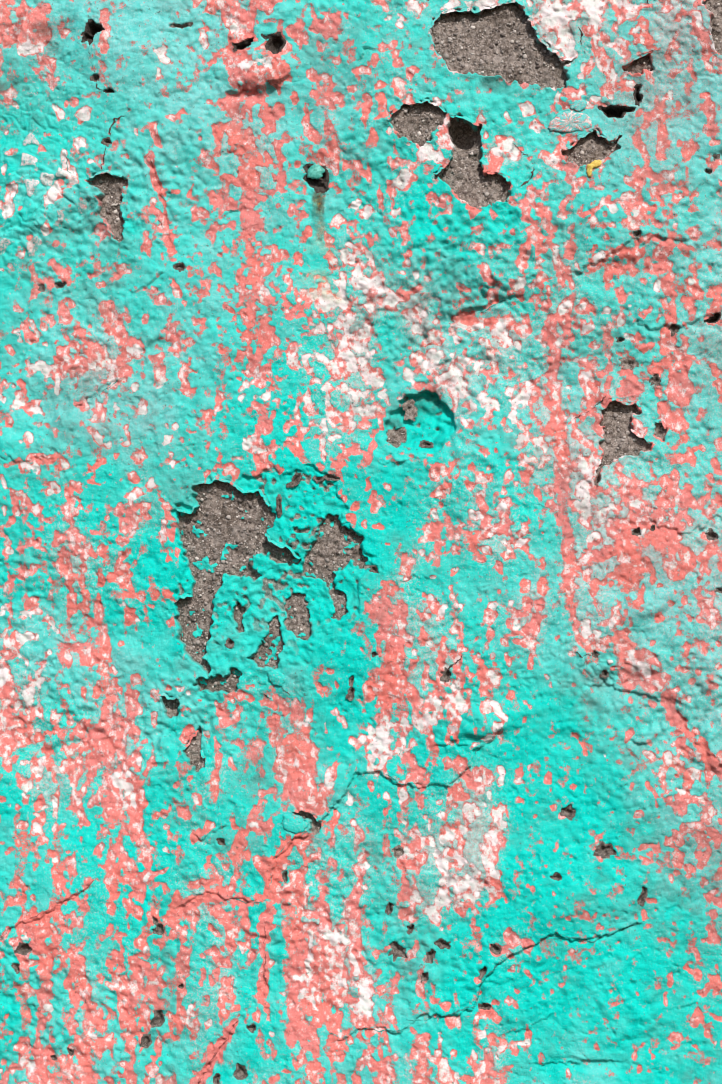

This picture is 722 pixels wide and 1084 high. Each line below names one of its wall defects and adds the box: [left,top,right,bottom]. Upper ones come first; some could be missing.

spalling [428,0,591,89]
peeling [548,0,722,166]
spalling [87,170,128,243]
spalling [387,99,511,209]
spalling [386,399,417,448]
peeling [546,277,721,635]
spalling [173,473,425,697]
peeling [251,593,319,790]
crack [228,726,504,995]
crack [332,921,645,1043]
peeling [50,1023,129,1084]
crack [196,1020,239,1084]